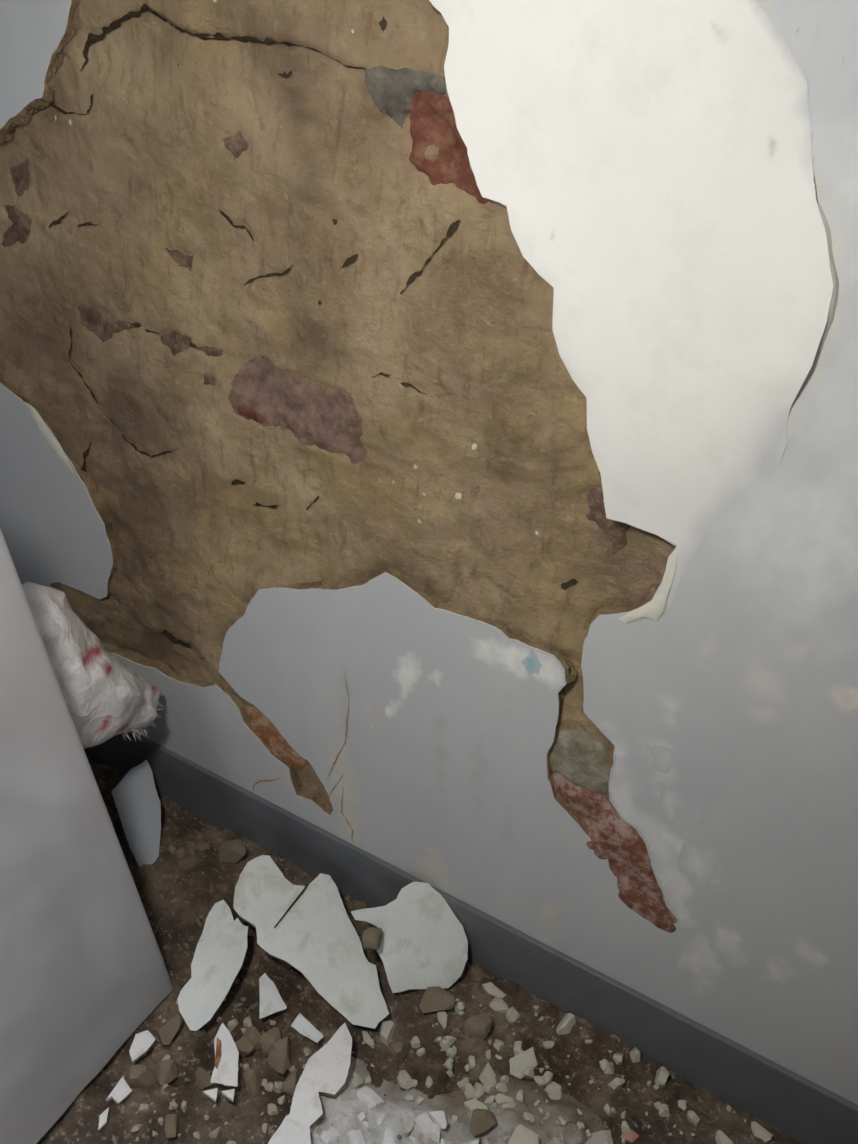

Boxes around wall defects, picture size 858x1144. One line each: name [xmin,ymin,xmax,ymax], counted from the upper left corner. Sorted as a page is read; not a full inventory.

crack [33,4,366,115]
spalling [0,0,839,840]
rust [249,768,290,798]
crack [246,672,354,843]